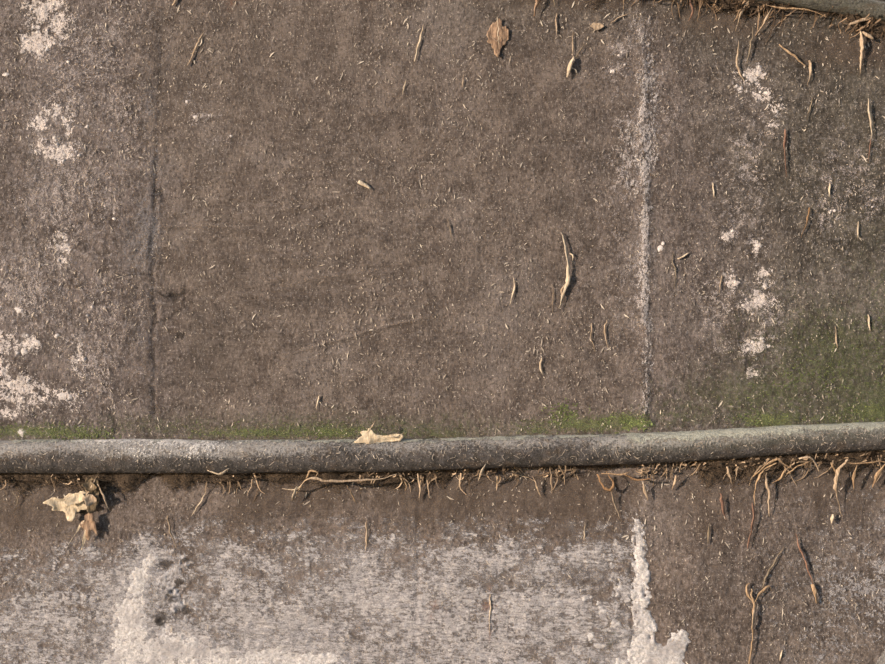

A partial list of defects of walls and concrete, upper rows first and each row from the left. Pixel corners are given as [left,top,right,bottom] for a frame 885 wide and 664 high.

leakage [0,0,161,420]
leakage [185,90,243,146]
leakage [594,15,682,412]
leakage [689,60,799,379]
leakage [806,125,885,233]
leakage [13,428,385,461]